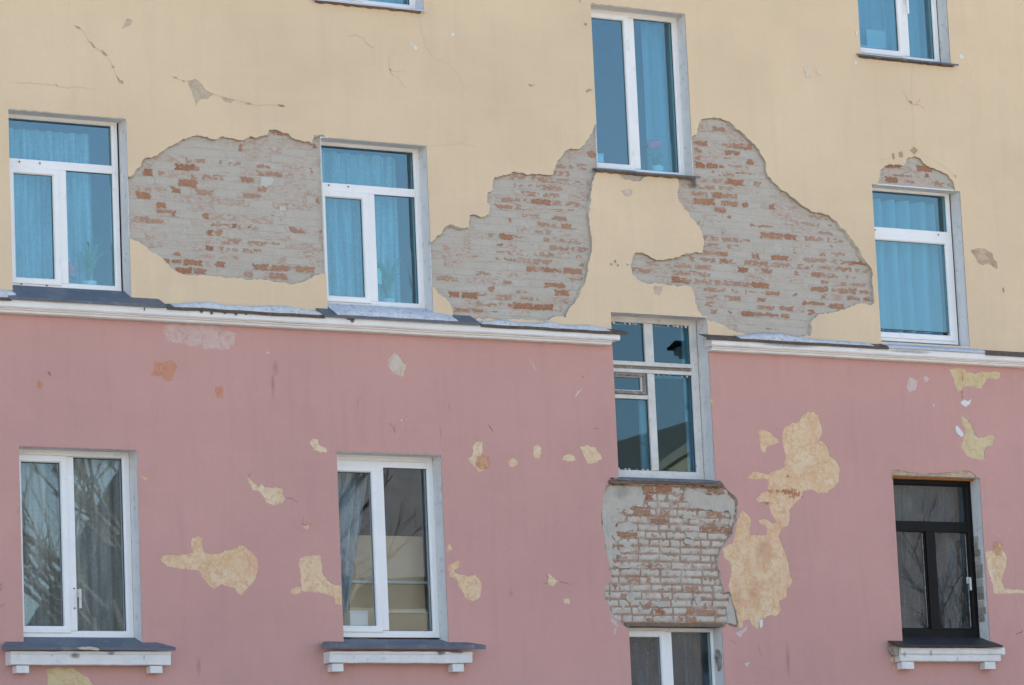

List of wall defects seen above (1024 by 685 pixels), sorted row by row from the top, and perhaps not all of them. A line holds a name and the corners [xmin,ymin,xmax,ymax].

crack [74,25,124,84]
spalling [878,147,956,191]
spalling [128,129,427,285]
spalling [430,128,597,321]
spalling [610,117,874,337]
peeling [949,368,1001,392]
peeling [891,416,995,479]
spalling [601,412,841,638]
peeling [160,536,259,595]
peeling [291,555,342,605]
peeling [447,543,482,601]
peeling [974,536,1024,622]